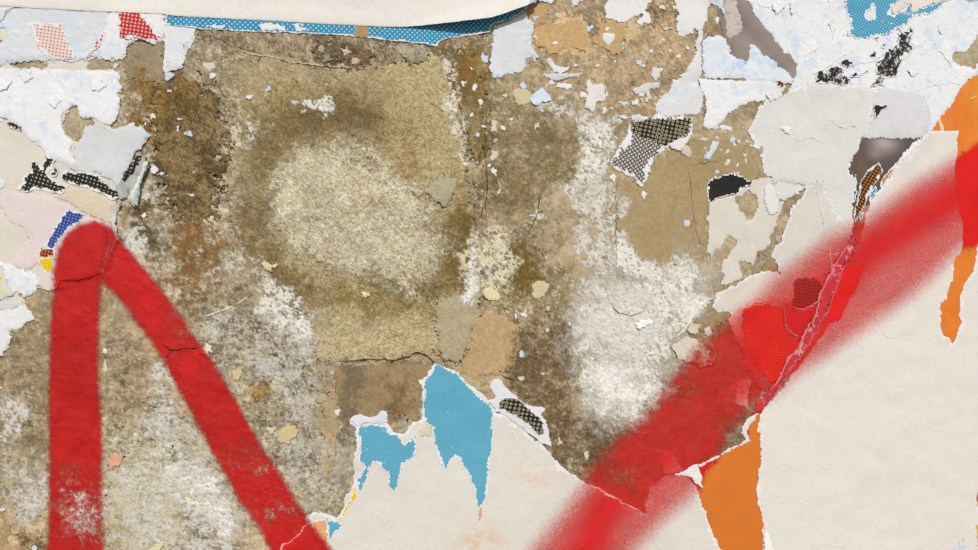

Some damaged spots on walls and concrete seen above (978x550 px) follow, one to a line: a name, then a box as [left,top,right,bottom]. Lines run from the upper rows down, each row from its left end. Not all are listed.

flaking render [528,3,628,57]
water stain [220,110,259,150]
water stain [292,95,335,117]
water stain [439,57,471,166]
flaking render [614,136,761,269]
water stain [448,92,720,464]
crack [339,352,454,370]
spalling [98,427,195,550]
flaking render [0,505,40,550]